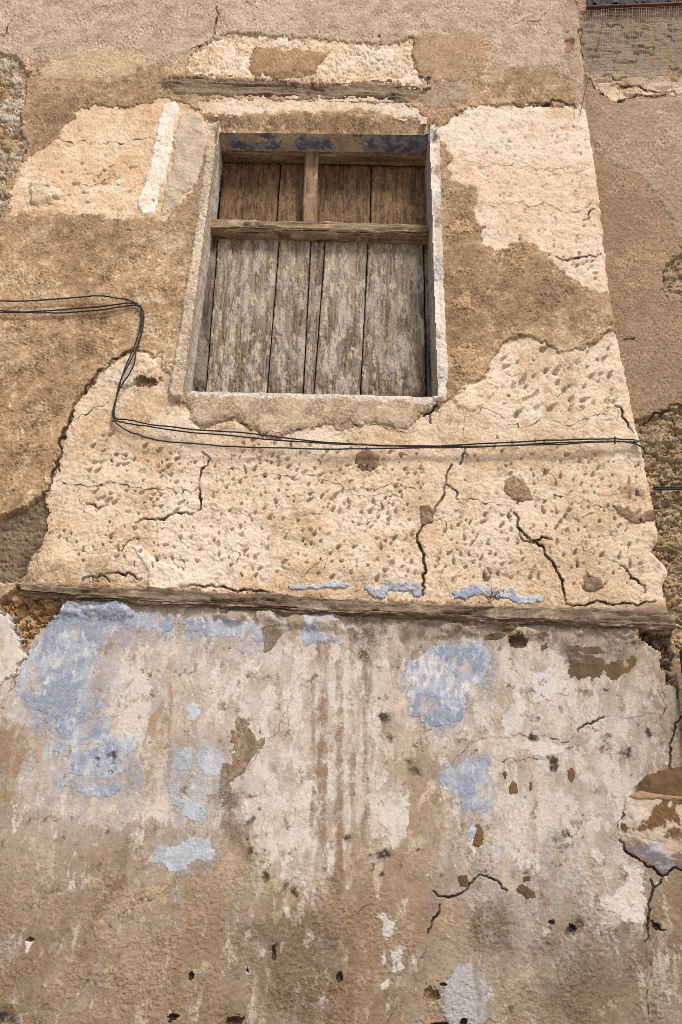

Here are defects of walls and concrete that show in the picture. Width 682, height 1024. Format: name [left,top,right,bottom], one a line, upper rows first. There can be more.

flaking render [0,34,609,293]
peeling [448,290,478,319]
crack [48,349,414,592]
crack [401,374,682,606]
flaking render [0,330,682,807]
damp [354,617,386,658]
peeling [173,798,207,824]
peeling [439,754,492,847]
peeling [131,834,216,906]
crack [617,811,681,925]
crack [419,875,502,959]
peeling [440,962,498,1024]